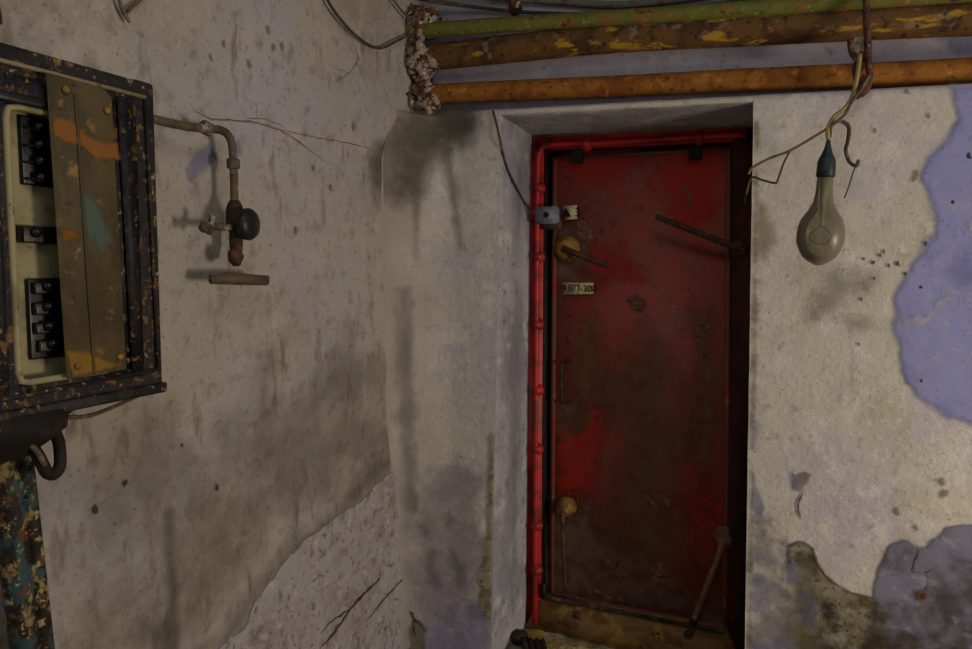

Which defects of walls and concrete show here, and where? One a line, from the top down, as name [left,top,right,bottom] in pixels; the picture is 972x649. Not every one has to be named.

leakage [372,112,474,197]
peeling [862,86,972,424]
peeling [793,472,808,519]
peeling [220,472,426,649]
crack [321,578,402,647]
peeling [789,525,972,649]
leakage [860,610,940,649]